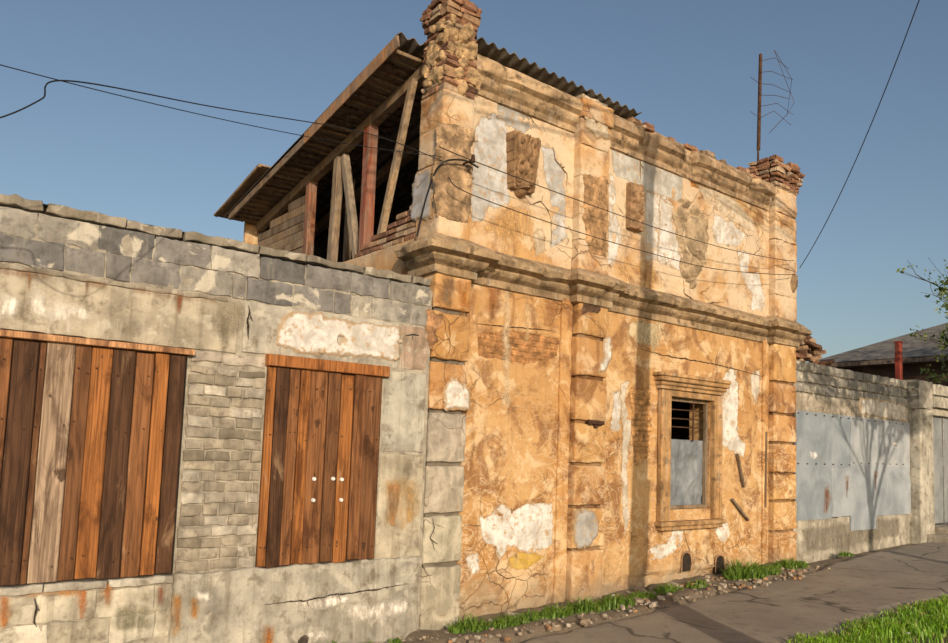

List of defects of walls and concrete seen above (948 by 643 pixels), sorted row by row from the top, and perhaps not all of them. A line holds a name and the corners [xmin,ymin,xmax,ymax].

spalling [410,104,535,223]
peeling [533,143,567,257]
spalling [582,116,765,311]
peeling [275,311,403,362]
peeling [443,377,471,411]
peeling [722,366,745,458]
peeling [751,370,762,403]
peeling [466,552,480,574]
peeling [479,502,553,570]